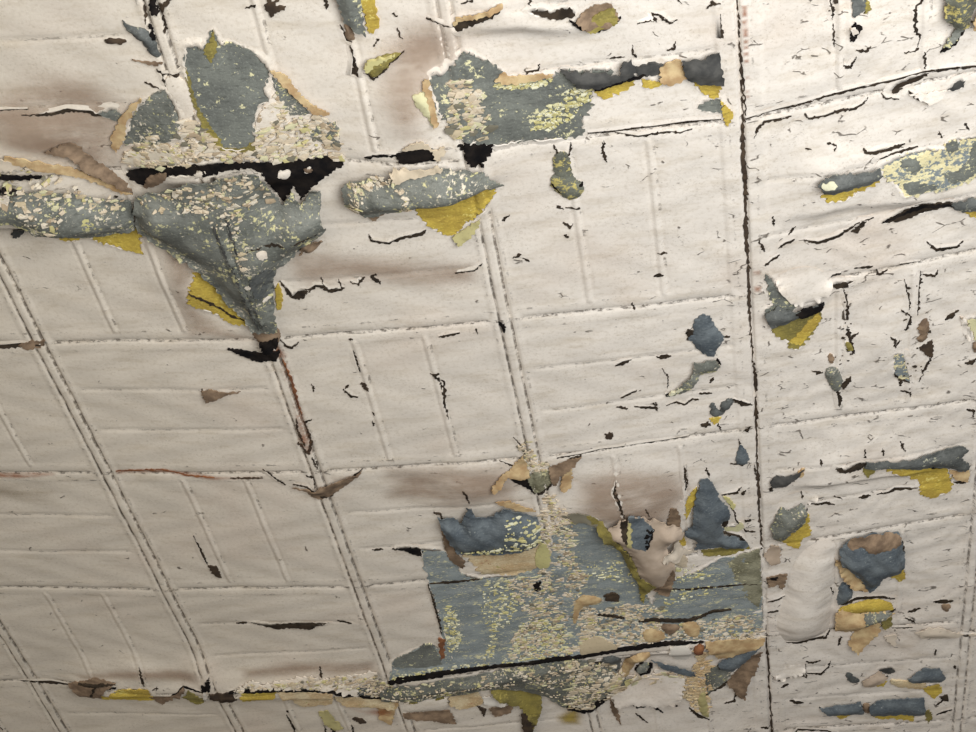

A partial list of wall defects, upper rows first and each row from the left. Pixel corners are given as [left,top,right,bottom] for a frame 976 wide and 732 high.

peeling [245,0,286,18]
peeling [324,0,404,81]
peeling [341,41,733,247]
peeling [0,25,345,363]
peeling [758,123,976,407]
peeling [730,426,757,476]
peeling [236,441,837,732]
peeling [833,531,920,656]
crack [20,680,116,697]
crack [139,668,203,696]
crack [229,640,704,732]
peeling [819,664,956,724]